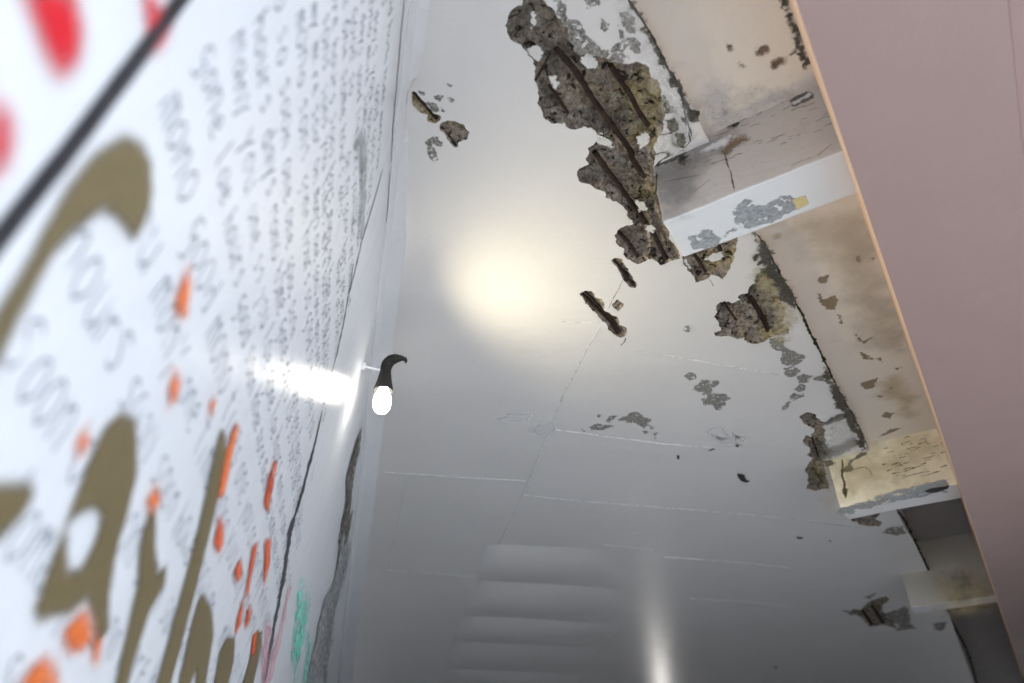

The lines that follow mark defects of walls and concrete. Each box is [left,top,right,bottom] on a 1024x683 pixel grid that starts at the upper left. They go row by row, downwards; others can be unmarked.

leakage [779,0,811,69]
spalling [412,84,469,161]
spalling [505,0,796,288]
leakage [656,153,688,167]
leakage [702,121,739,151]
spalling [580,291,627,338]
spalling [714,283,825,410]
peeling [684,372,730,410]
peeling [581,412,657,438]
spalling [800,394,867,491]
spalling [844,593,915,631]